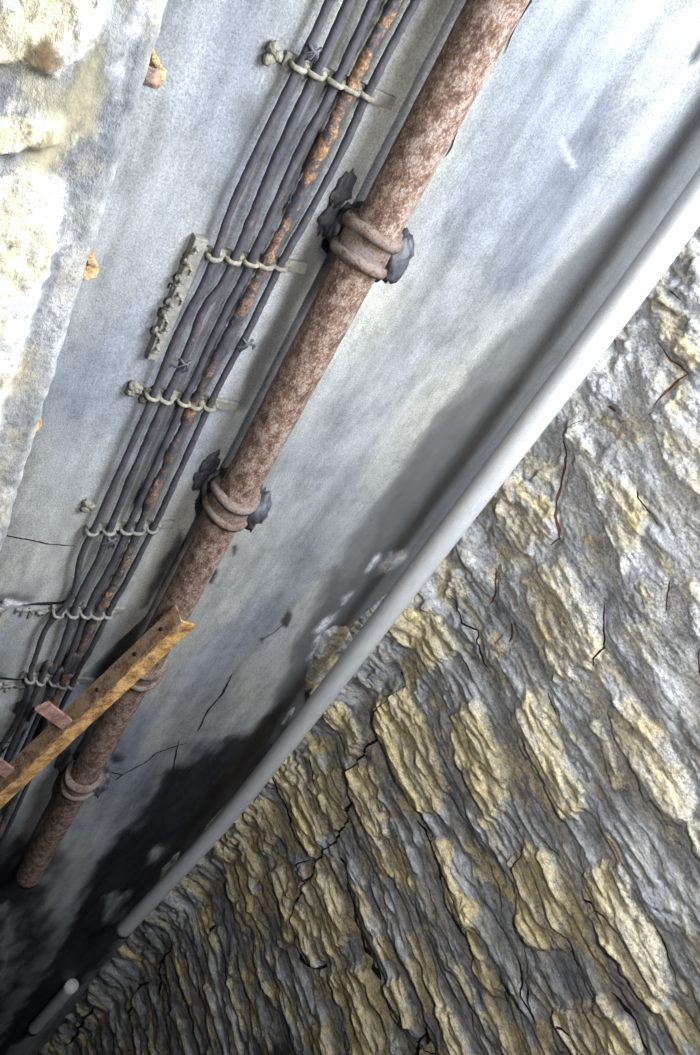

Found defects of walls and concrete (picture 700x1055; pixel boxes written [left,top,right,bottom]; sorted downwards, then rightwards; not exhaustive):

crack [505,0,532,52]
crack [6,535,76,547]
leakage [275,111,700,722]
leakage [0,709,293,1055]